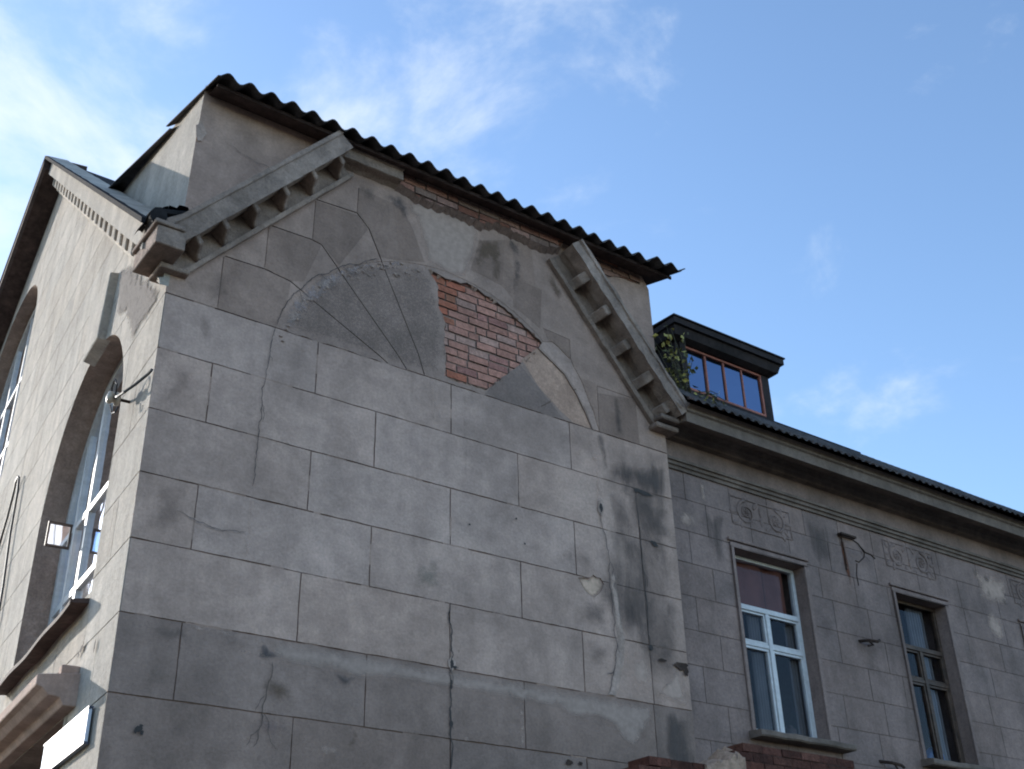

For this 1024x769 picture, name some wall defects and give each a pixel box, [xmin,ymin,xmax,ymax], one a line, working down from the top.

crack [252,258,376,486]
flaking render [279,173,591,428]
crack [247,662,275,748]
crack [448,603,459,768]
crack [600,513,620,694]